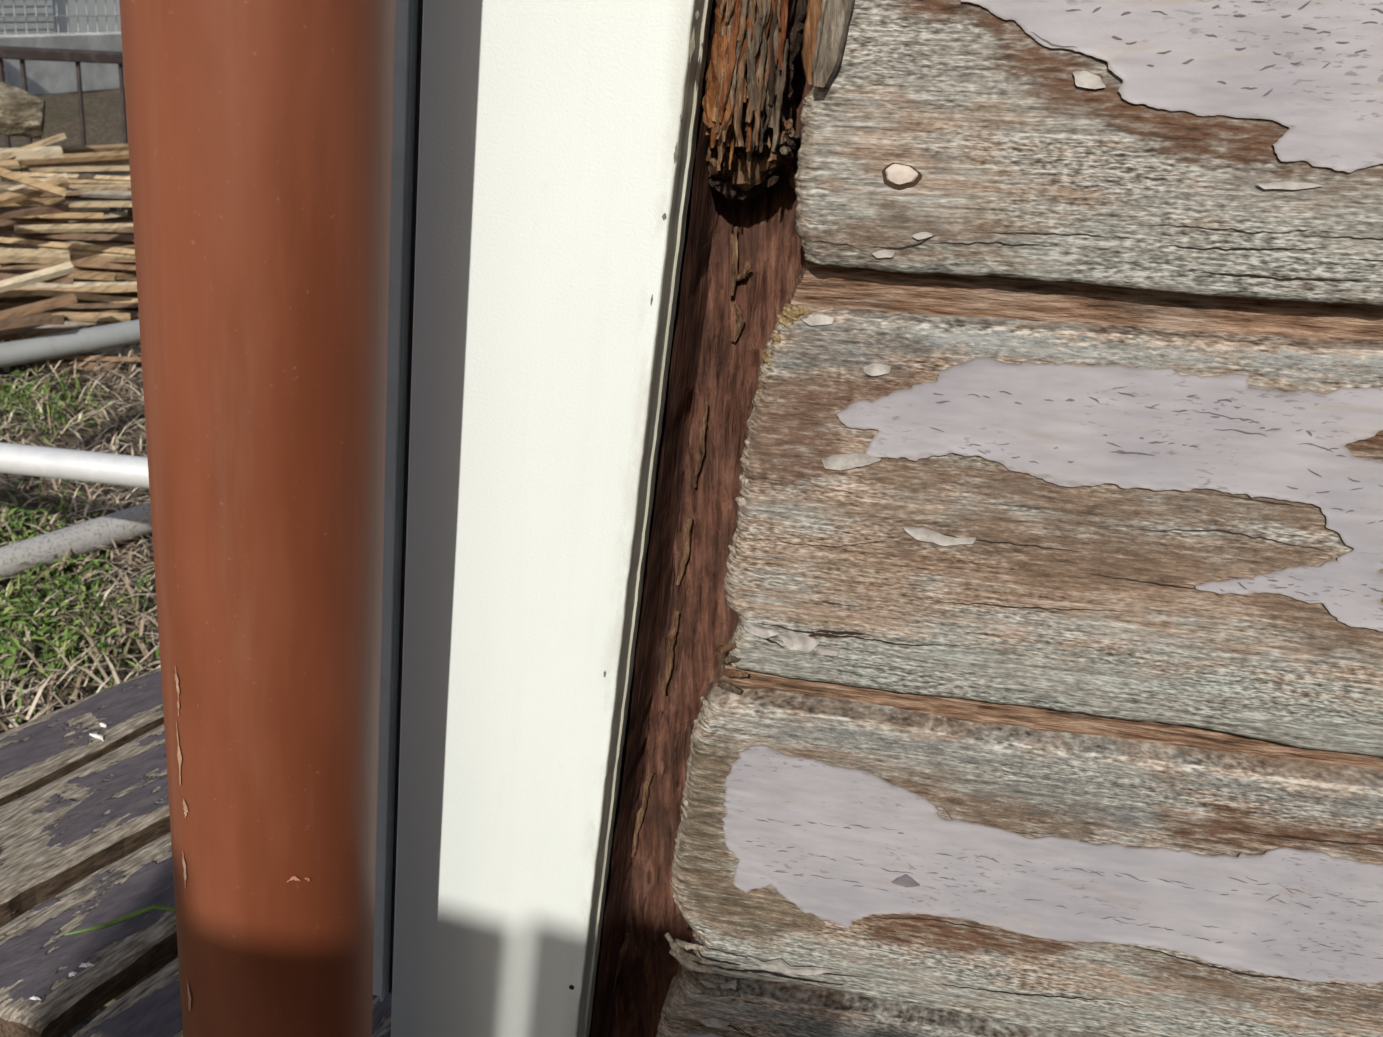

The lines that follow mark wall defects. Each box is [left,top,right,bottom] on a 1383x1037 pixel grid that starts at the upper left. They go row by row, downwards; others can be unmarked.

peeling [961,0,1383,190]
peeling [872,249,895,258]
peeling [912,232,932,240]
peeling [802,313,834,326]
peeling [822,357,1383,632]
peeling [739,617,840,656]
peeling [722,744,1383,984]
peeling [687,1018,730,1037]